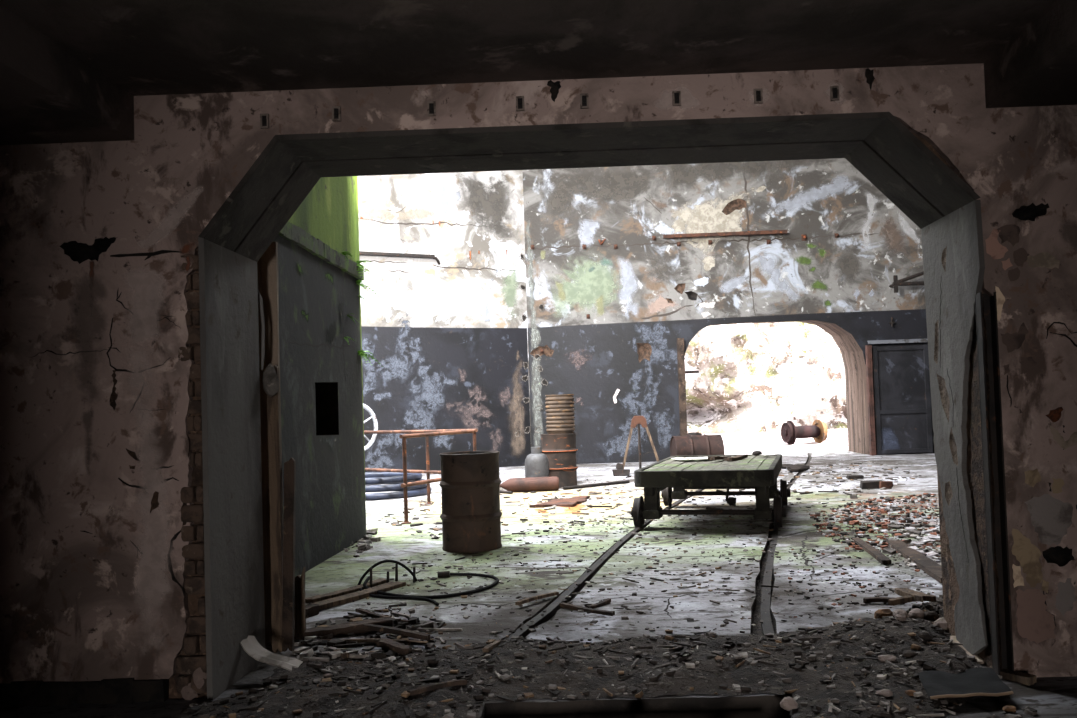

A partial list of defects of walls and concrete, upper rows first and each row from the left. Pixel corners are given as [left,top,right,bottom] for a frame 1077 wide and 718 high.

spalling [60,237,117,279]
crack [33,287,177,412]
crack [1046,322,1077,347]